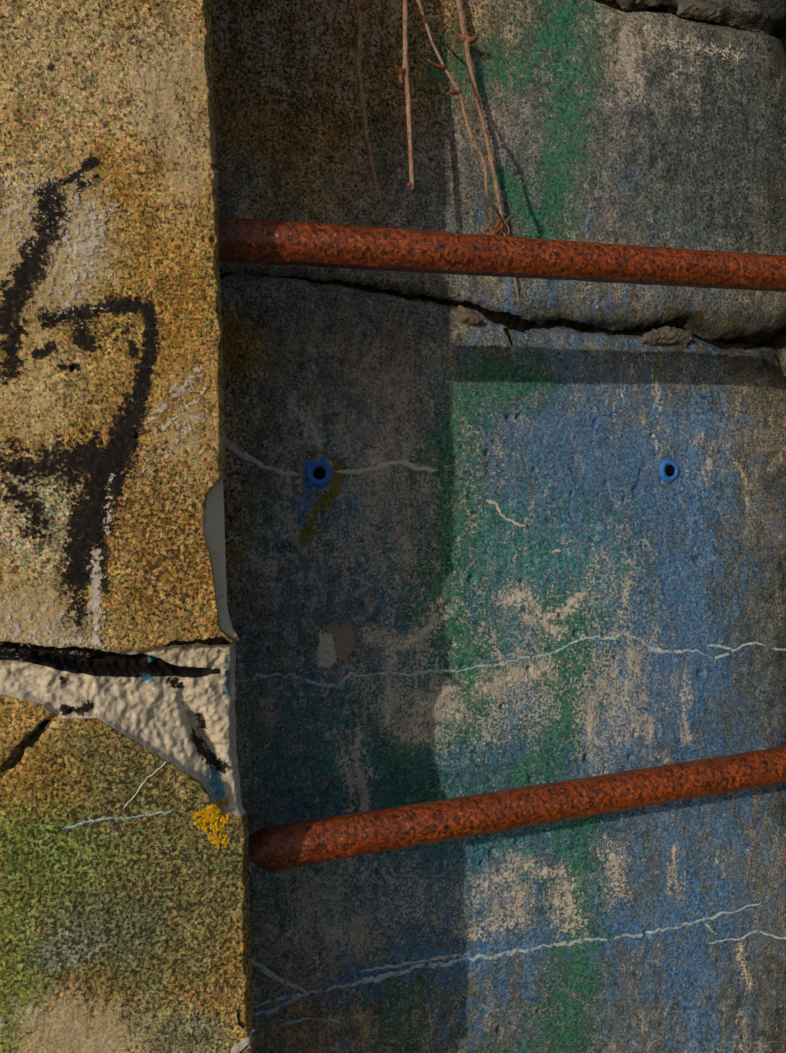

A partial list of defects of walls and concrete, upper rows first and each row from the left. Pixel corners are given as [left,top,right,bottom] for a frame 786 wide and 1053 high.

crack [595,0,760,33]
crack [220,272,772,350]
crack [225,437,305,476]
crack [335,460,439,475]
spalling [0,477,246,816]
crack [0,633,786,688]
crack [4,720,51,771]
crack [231,900,786,1053]